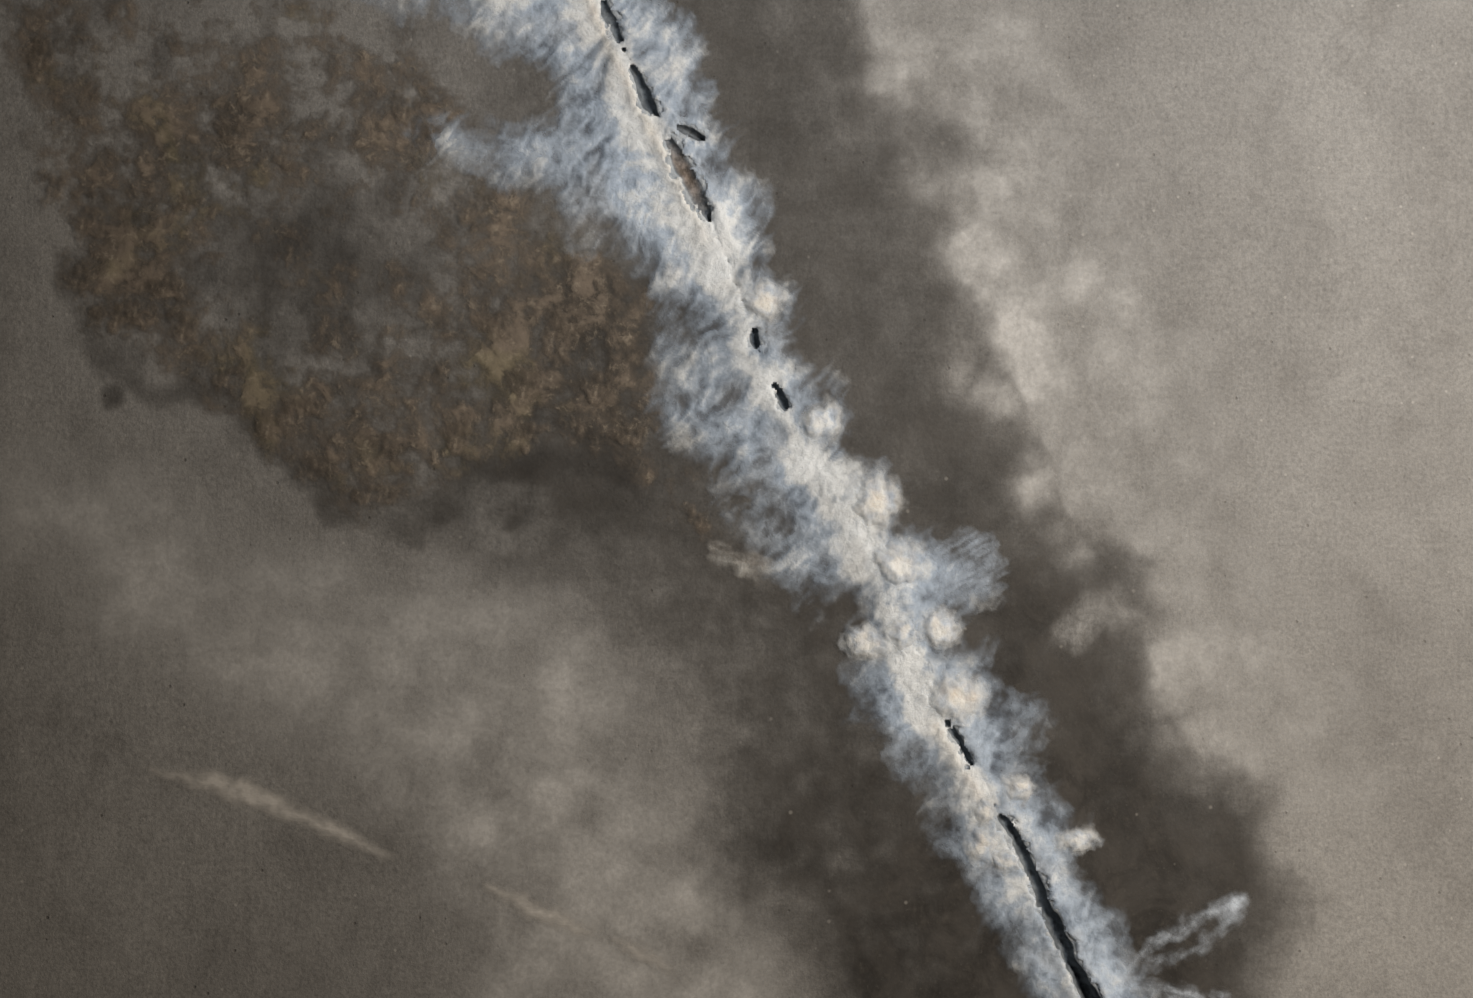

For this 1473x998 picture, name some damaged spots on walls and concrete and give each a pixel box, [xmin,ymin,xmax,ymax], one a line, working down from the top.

damp [435,127,482,160]
crack [600,0,713,222]
crack [728,259,743,286]
crack [747,326,806,424]
damp [469,0,1272,998]
efflorescence [15,486,763,998]
crack [944,719,976,770]
crack [994,803,1102,998]